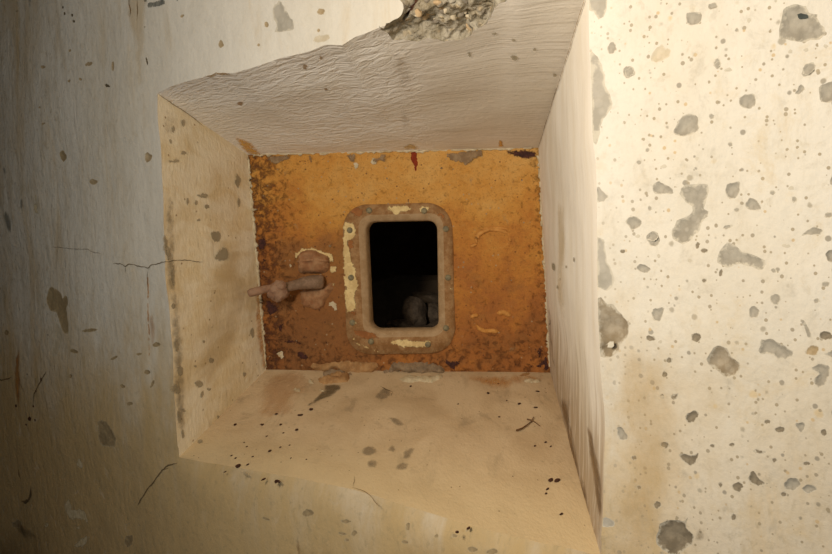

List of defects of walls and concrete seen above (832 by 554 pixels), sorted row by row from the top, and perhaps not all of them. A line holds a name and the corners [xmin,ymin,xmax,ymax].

spalling [379,0,507,42]
crack [138,463,176,504]